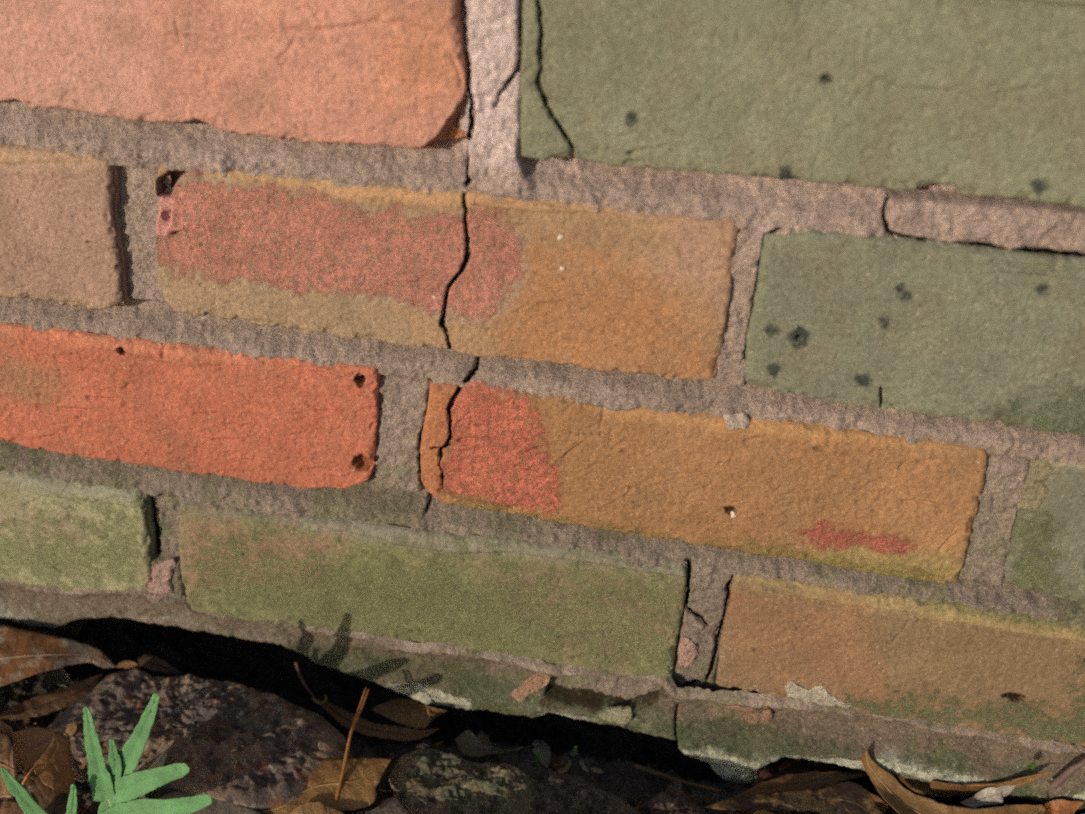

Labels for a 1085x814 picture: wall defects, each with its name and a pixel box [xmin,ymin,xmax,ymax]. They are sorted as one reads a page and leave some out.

crack [440,0,574,349]
crack [882,194,928,241]
crack [956,241,1085,257]
crack [419,356,479,514]
crack [674,558,733,747]
spalling [510,672,667,724]
peeling [724,704,773,725]